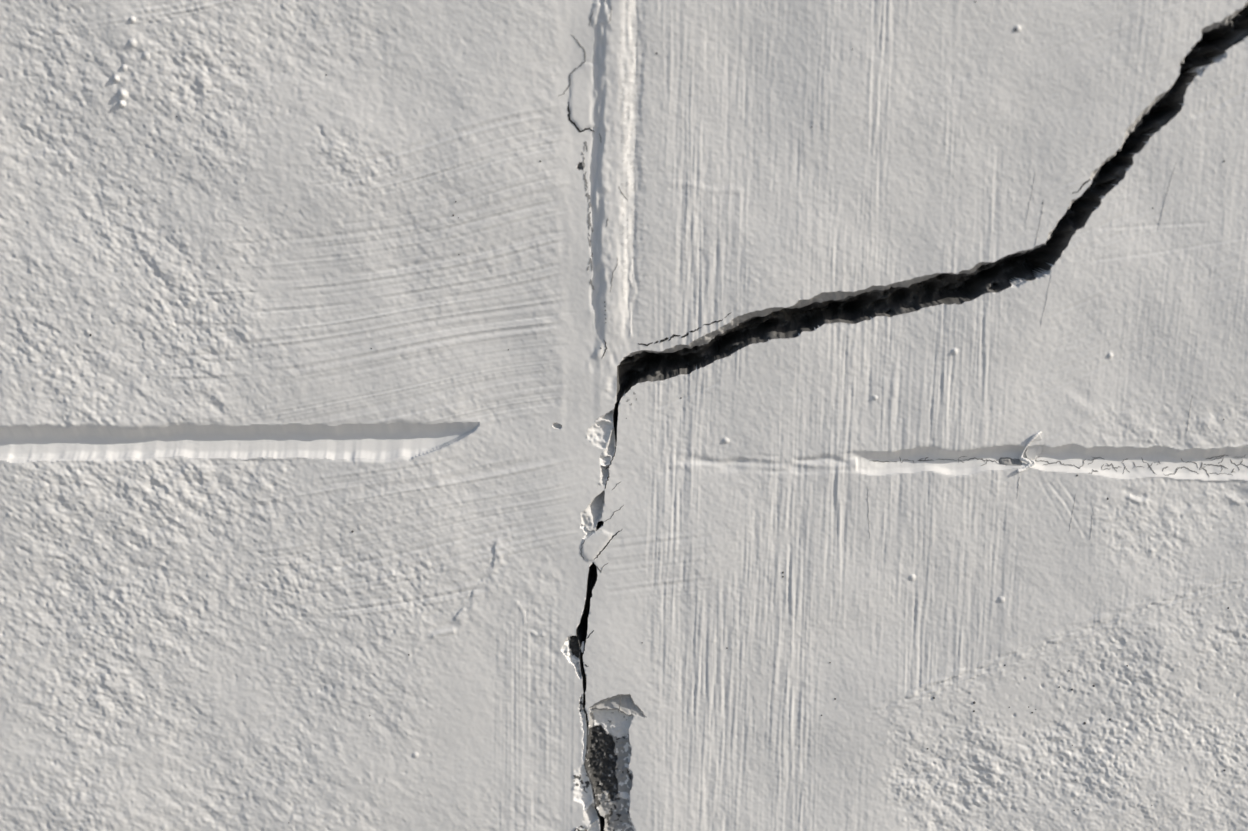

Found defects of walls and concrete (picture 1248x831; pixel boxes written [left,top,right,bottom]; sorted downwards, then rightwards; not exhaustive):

peeling [580,410,615,561]
crack [559,2,1248,831]
spalling [561,634,645,831]